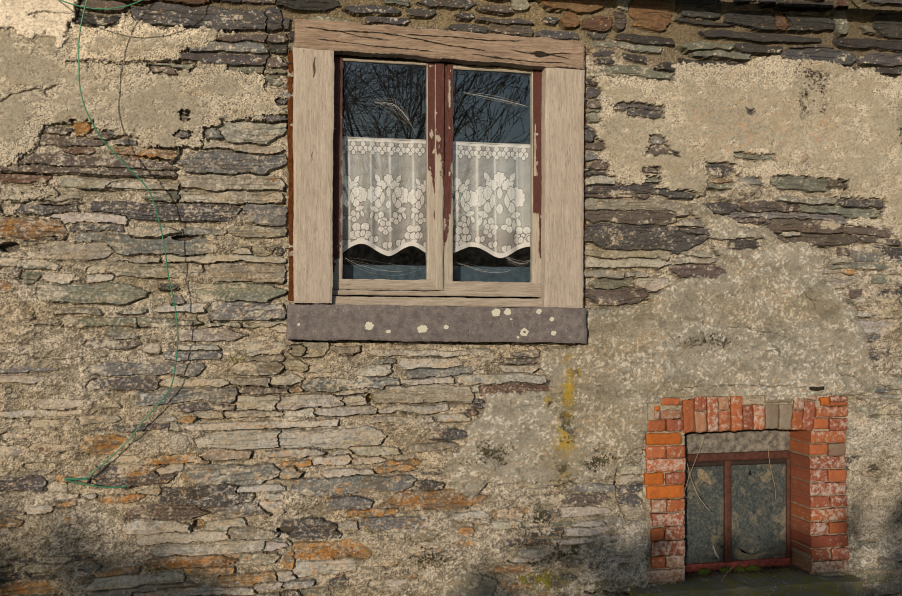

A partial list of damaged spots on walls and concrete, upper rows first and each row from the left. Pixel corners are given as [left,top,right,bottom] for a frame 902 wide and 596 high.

flaking render [0,0,92,168]
flaking render [590,55,902,239]
peeling [0,243,21,253]
spalling [14,57,577,512]
flaking render [444,165,902,595]
peeling [192,519,207,530]
peeling [276,527,297,535]
flaking render [433,570,498,596]